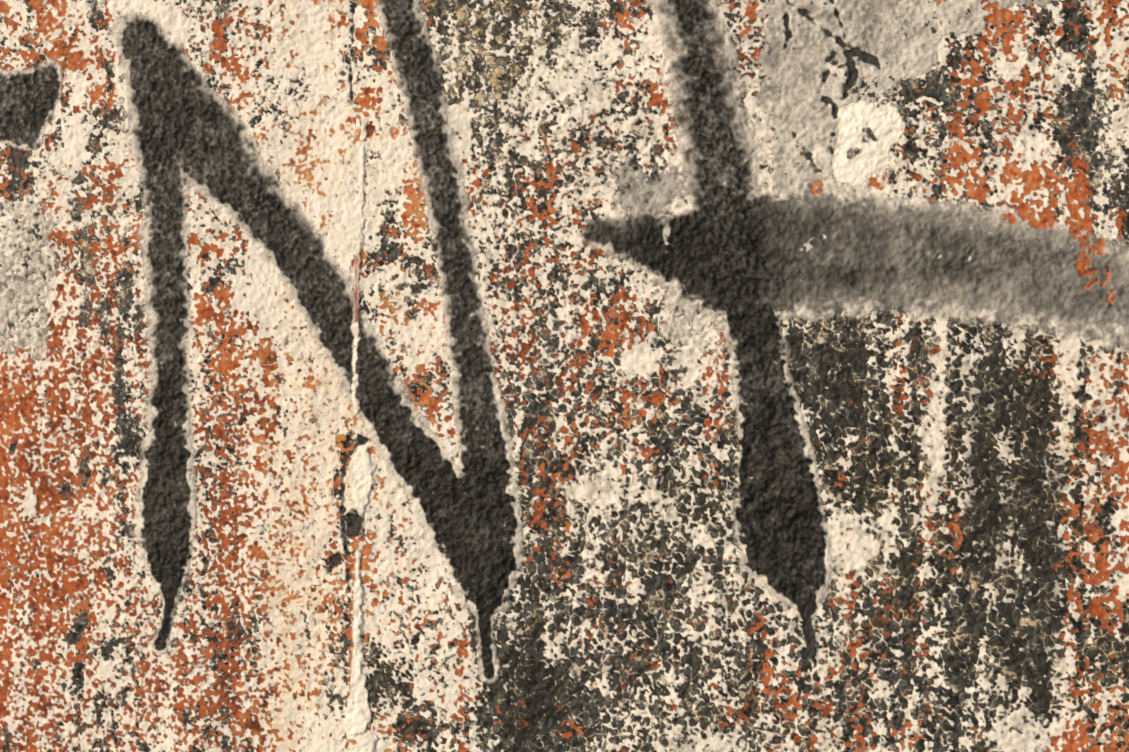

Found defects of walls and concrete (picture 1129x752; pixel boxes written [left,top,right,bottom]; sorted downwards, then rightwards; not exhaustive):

peeling [0,0,321,752]
spalling [307,0,1129,752]
crack [783,0,880,172]